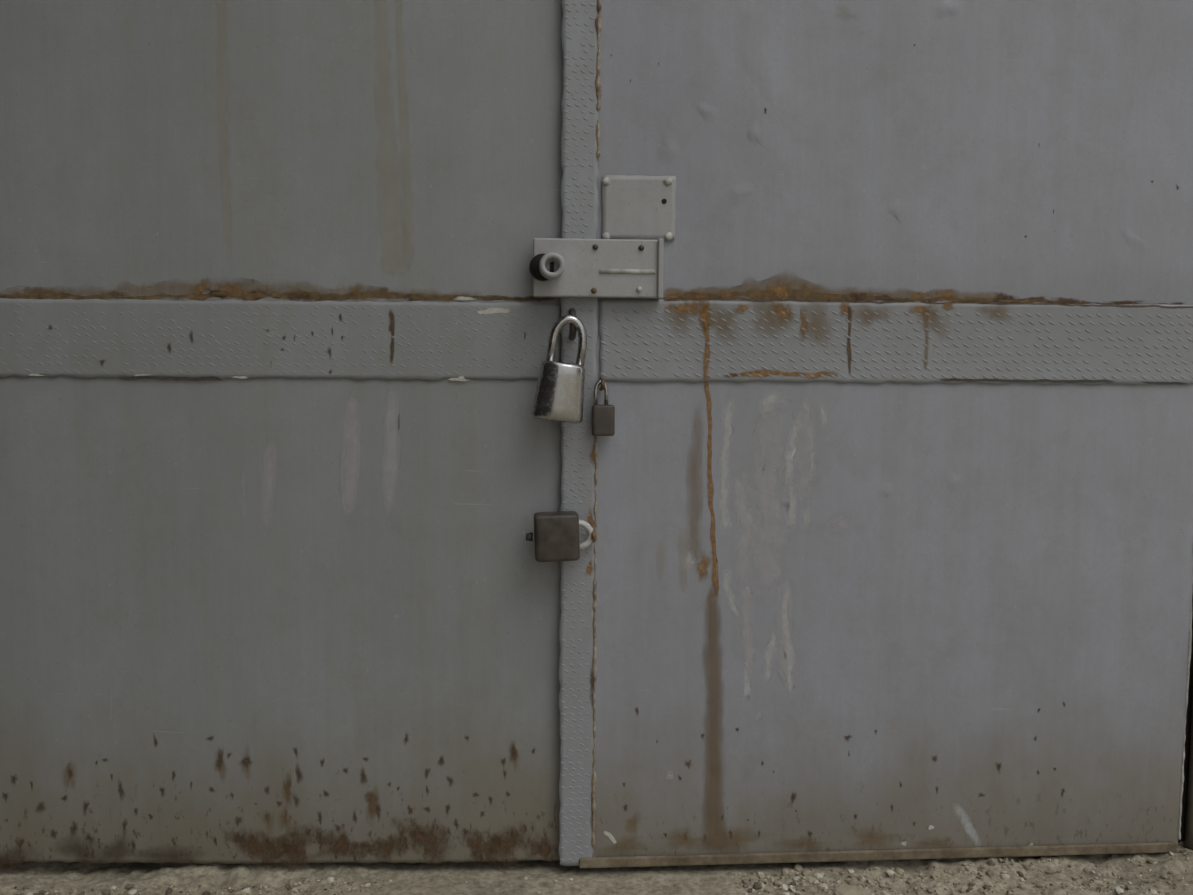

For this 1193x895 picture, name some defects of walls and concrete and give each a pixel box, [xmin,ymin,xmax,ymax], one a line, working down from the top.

corrosion [0,281,554,362]
corrosion [664,285,1138,845]
corrosion [233,769,551,864]